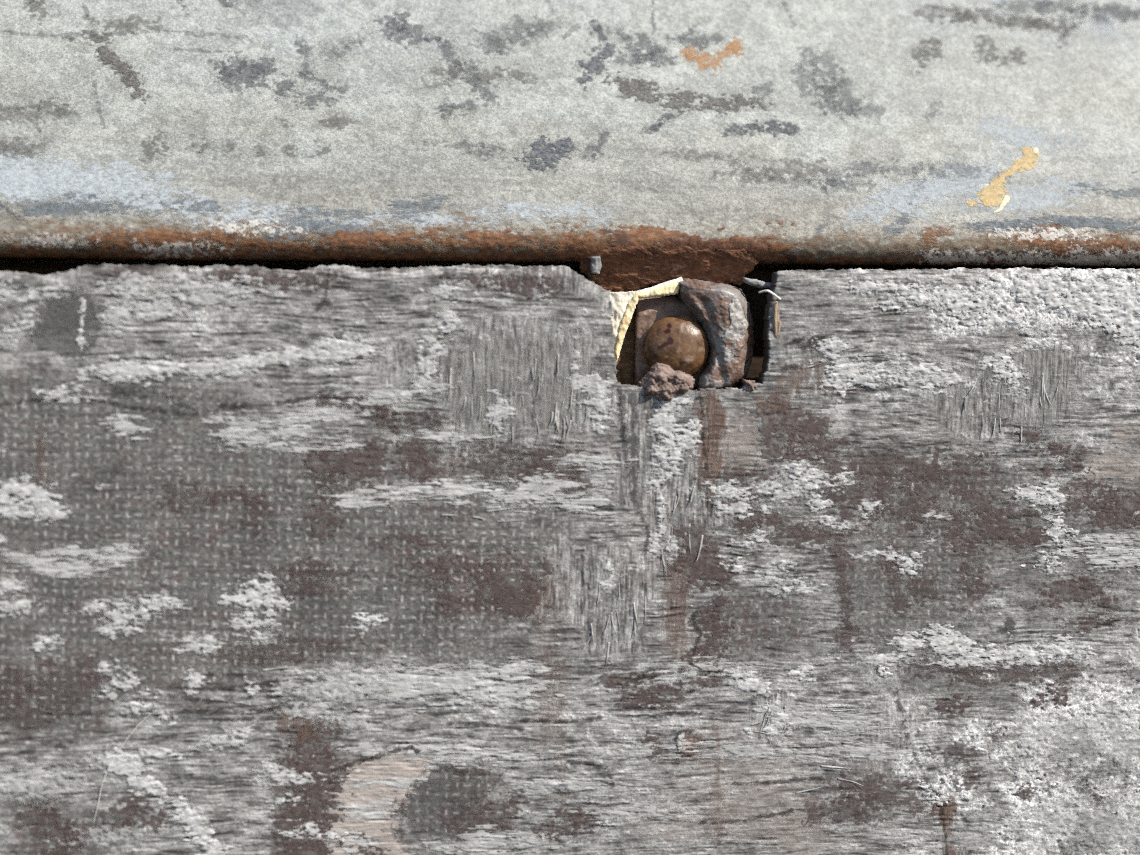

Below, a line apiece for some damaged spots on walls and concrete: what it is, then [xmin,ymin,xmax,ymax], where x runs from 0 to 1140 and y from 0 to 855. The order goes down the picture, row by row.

rust [678,37,745,71]
rust [0,211,1140,266]
rust [721,298,748,363]